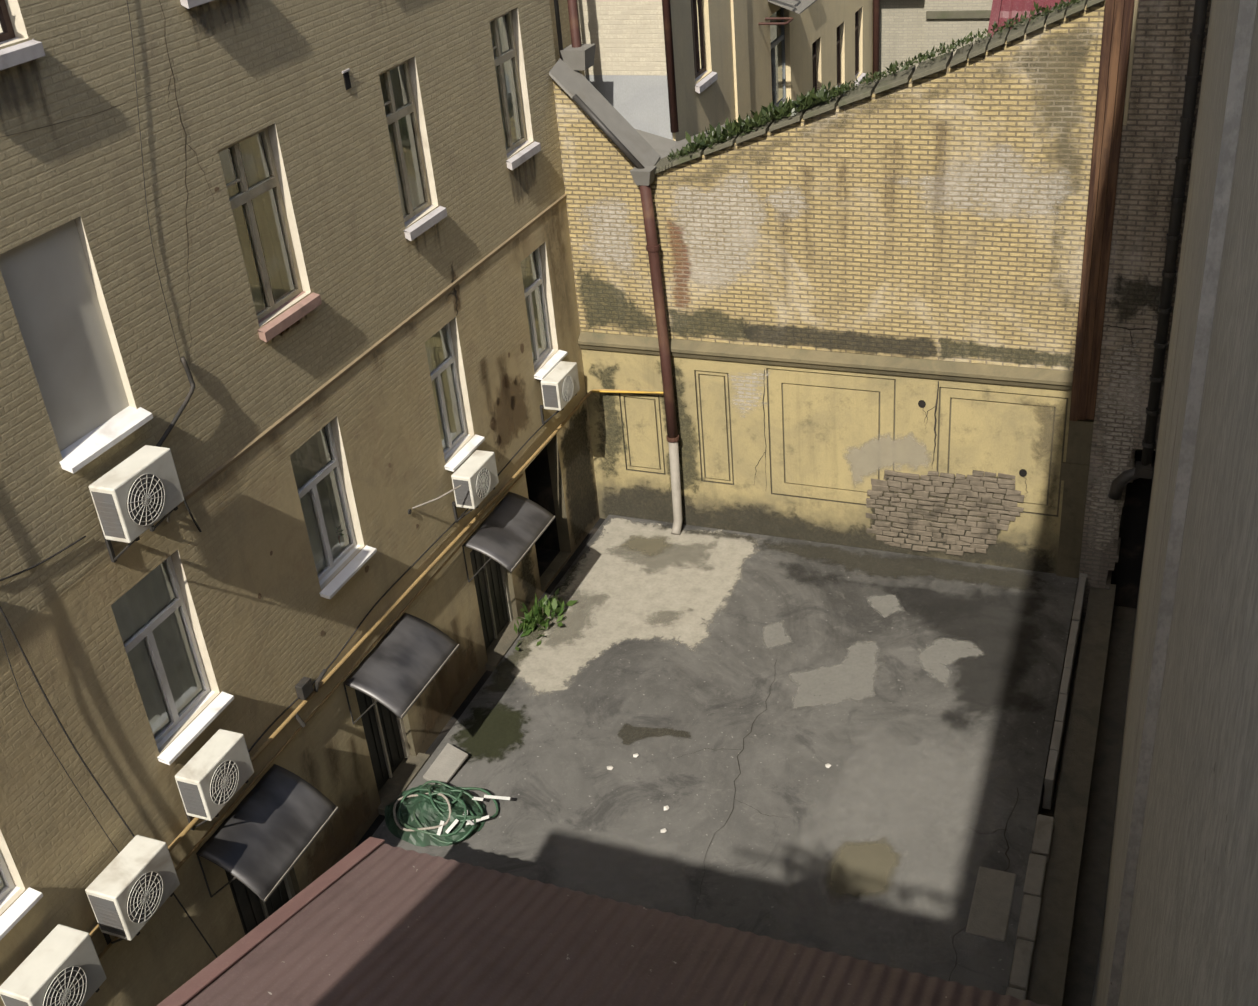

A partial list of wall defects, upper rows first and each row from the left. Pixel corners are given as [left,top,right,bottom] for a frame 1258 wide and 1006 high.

crack [2,0,214,359]
water stain [426,650,477,729]
water stain [452,363,1053,763]
flaking render [866,469,1027,556]